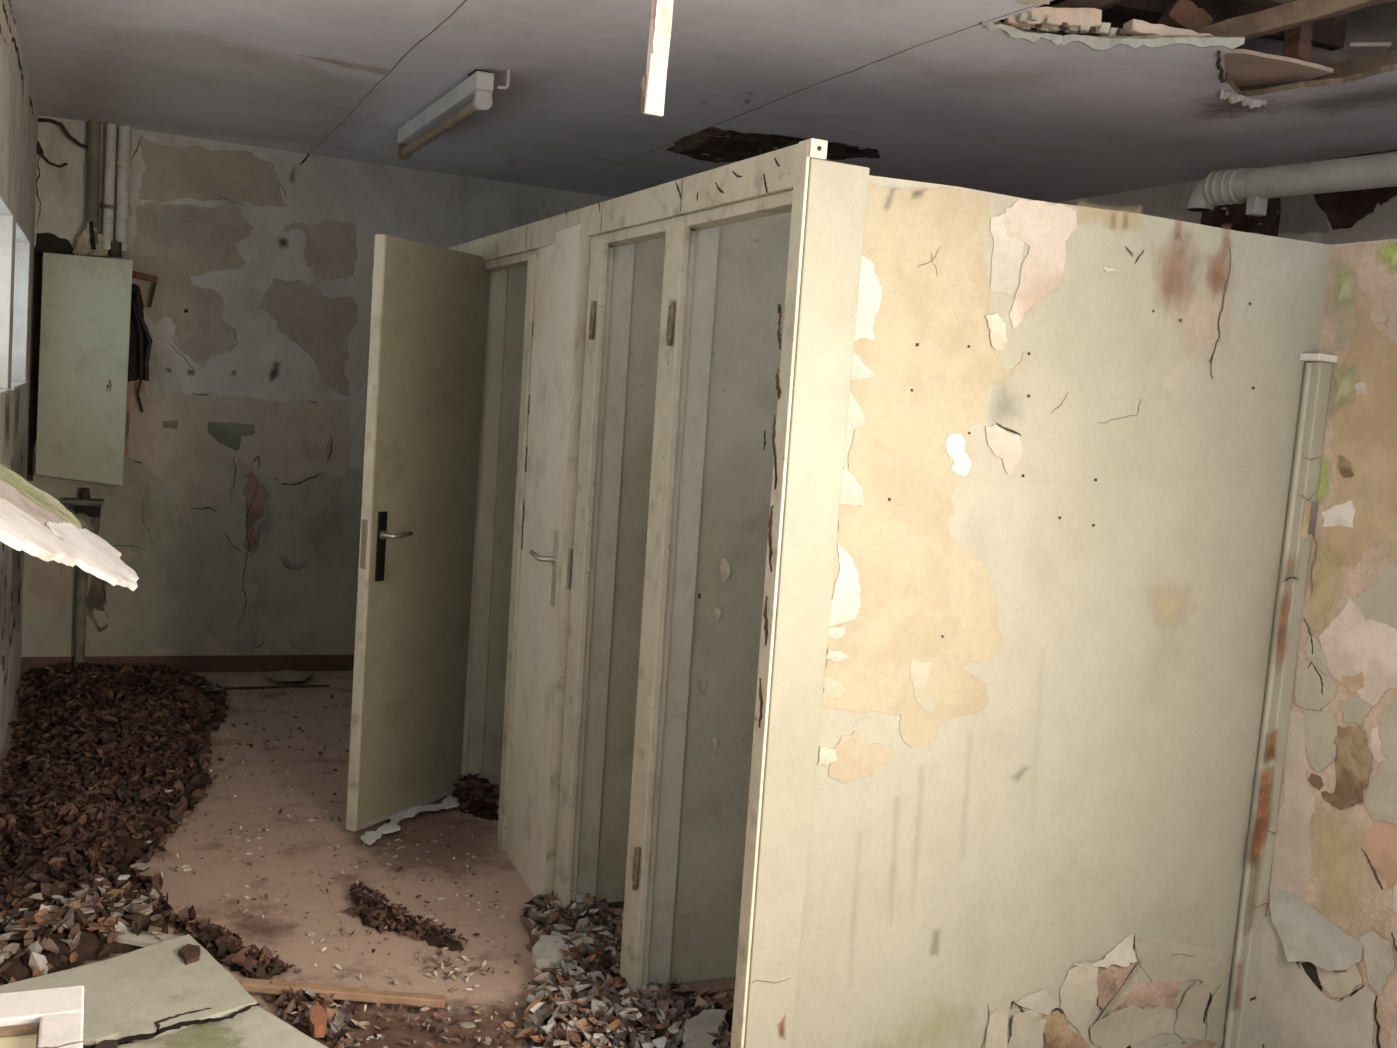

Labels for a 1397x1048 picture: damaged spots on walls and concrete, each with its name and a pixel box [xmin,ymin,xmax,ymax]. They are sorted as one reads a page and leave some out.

crack [0,0,34,120]
crack [299,0,467,166]
flaking render [667,127,807,192]
flaking render [826,142,881,160]
peeling [124,136,358,528]
crack [1209,250,1231,379]
peeling [818,183,1077,784]
flaking render [1,542,108,683]
rust [1278,594,1289,658]
rust [1250,733,1275,862]
peeling [1249,595,1397,1048]
peeling [984,933,1227,1048]